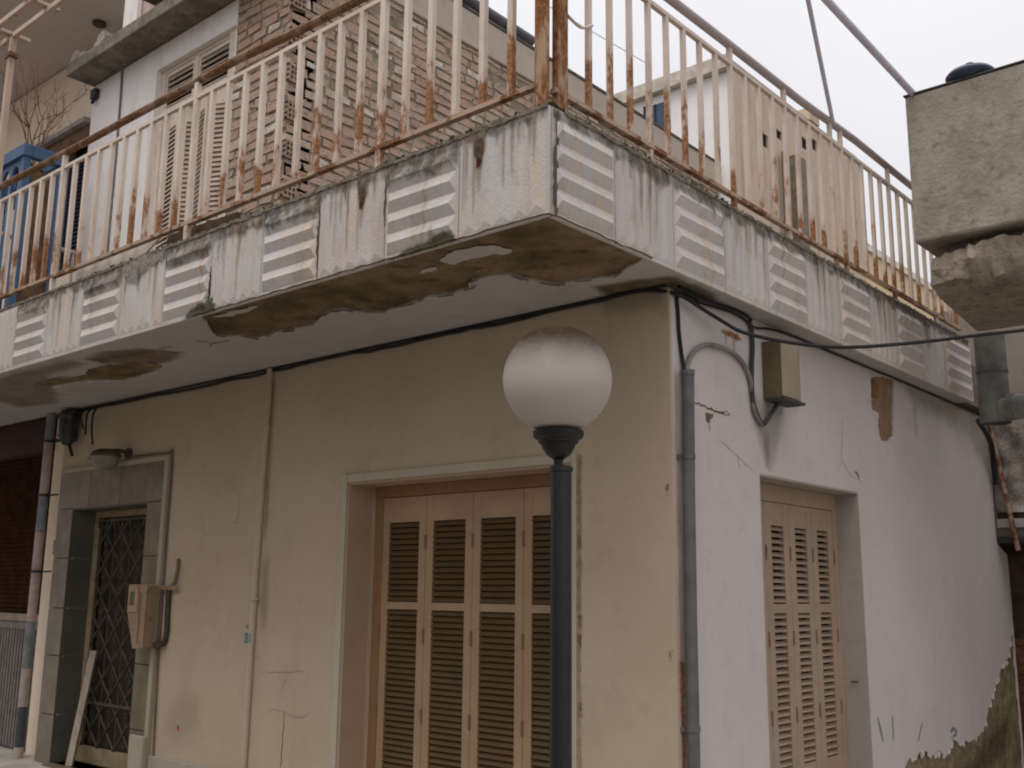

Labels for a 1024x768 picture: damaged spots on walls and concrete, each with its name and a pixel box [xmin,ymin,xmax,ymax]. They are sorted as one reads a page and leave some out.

water stain [154,107,969,347]
water stain [17,262,129,313]
peeling [193,213,653,340]
water stain [0,362,75,406]
peeling [34,362,162,389]
water stain [88,349,177,363]
crack [694,402,750,469]
flaking render [870,376,897,441]
crack [269,671,310,767]
flaking render [905,631,1022,768]